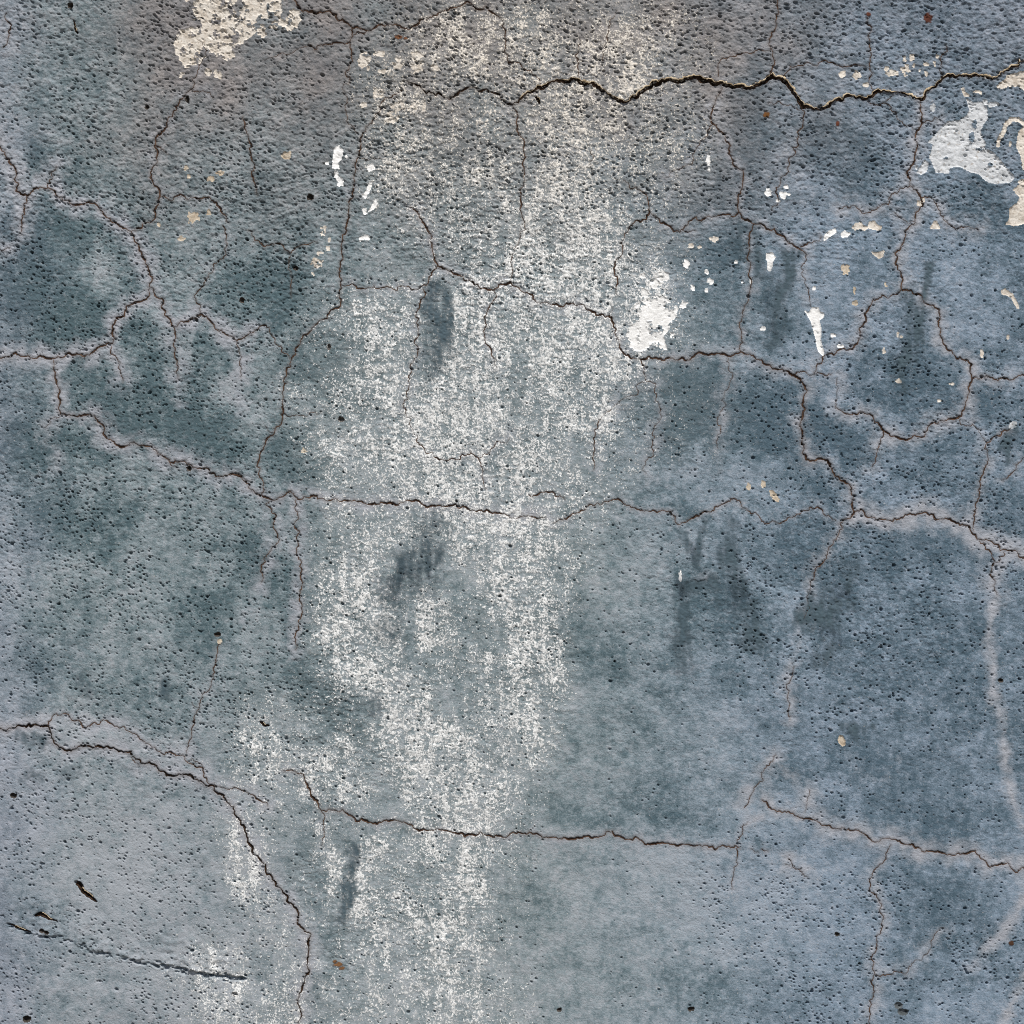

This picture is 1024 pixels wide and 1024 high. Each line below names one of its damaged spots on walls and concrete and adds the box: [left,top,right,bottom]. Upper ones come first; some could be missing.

peeling [173,0,302,79]
peeling [915,71,1024,226]
crack [0,0,1024,645]
peeling [626,269,714,352]
peeling [805,307,844,356]
damp [152,0,719,1024]
damp [674,520,763,667]
damp [796,568,857,664]
crack [0,644,311,1024]
crack [286,761,1024,1024]